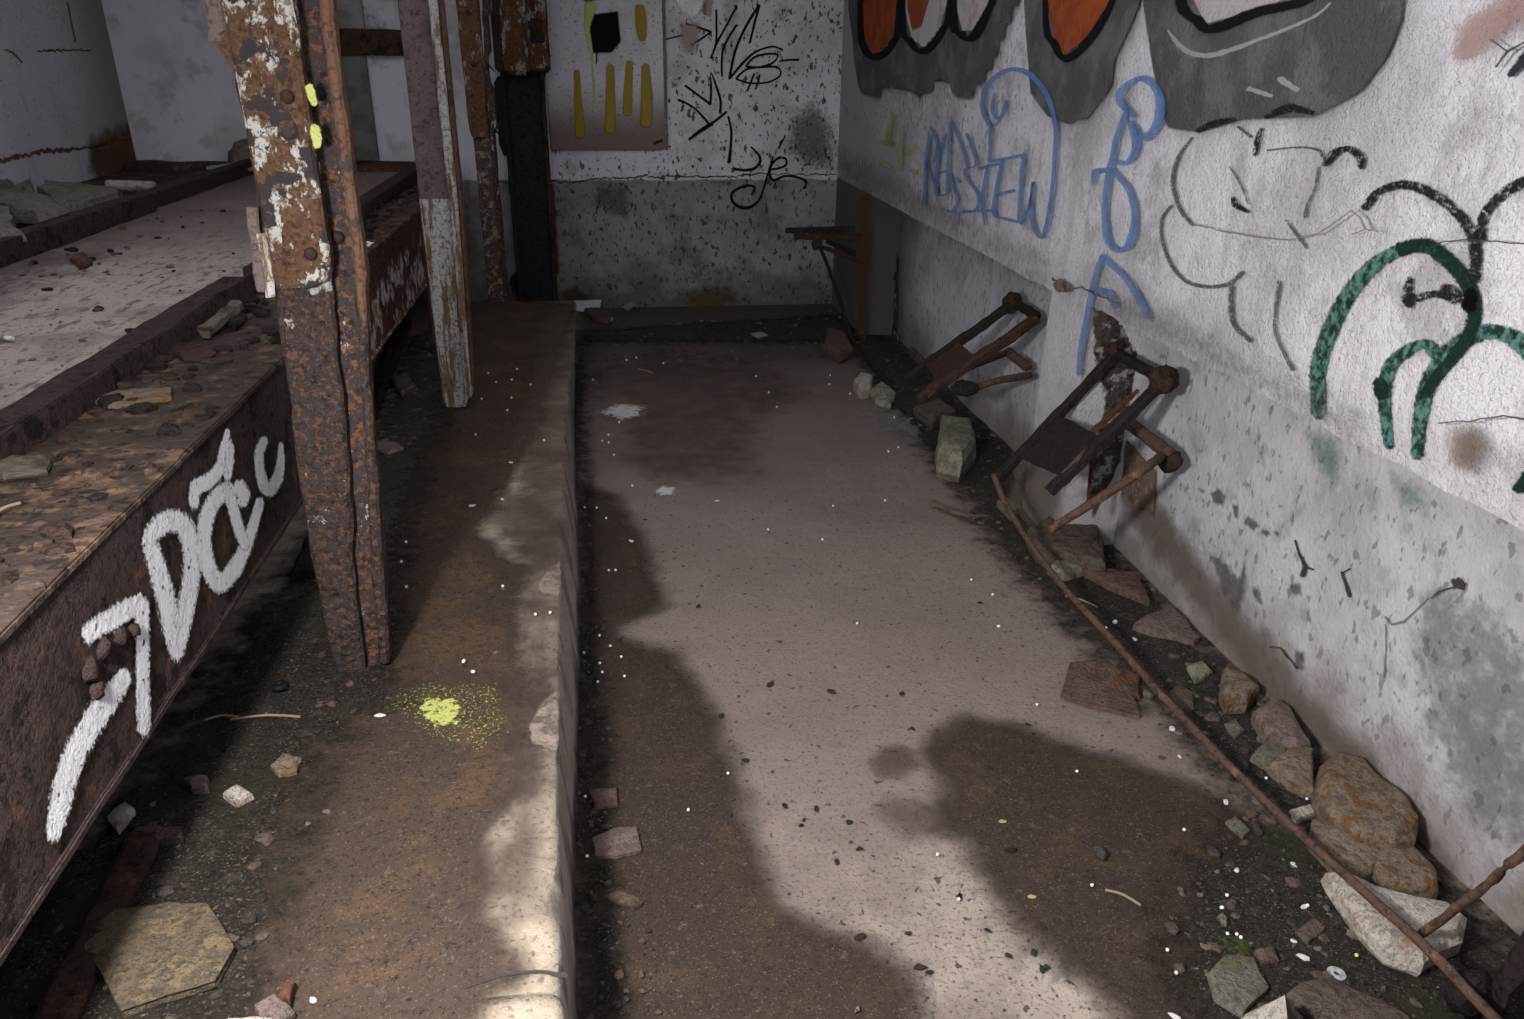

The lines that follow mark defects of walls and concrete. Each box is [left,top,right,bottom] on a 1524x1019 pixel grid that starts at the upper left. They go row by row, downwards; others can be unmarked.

crack [1490,39,1524,67]
corrosion [0,127,136,177]
corrosion [1,209,233,300]
crack [1189,209,1379,241]
crack [1429,239,1524,249]
corrosion [0,294,279,556]
spalling [1089,310,1157,517]
crack [1438,415,1524,424]